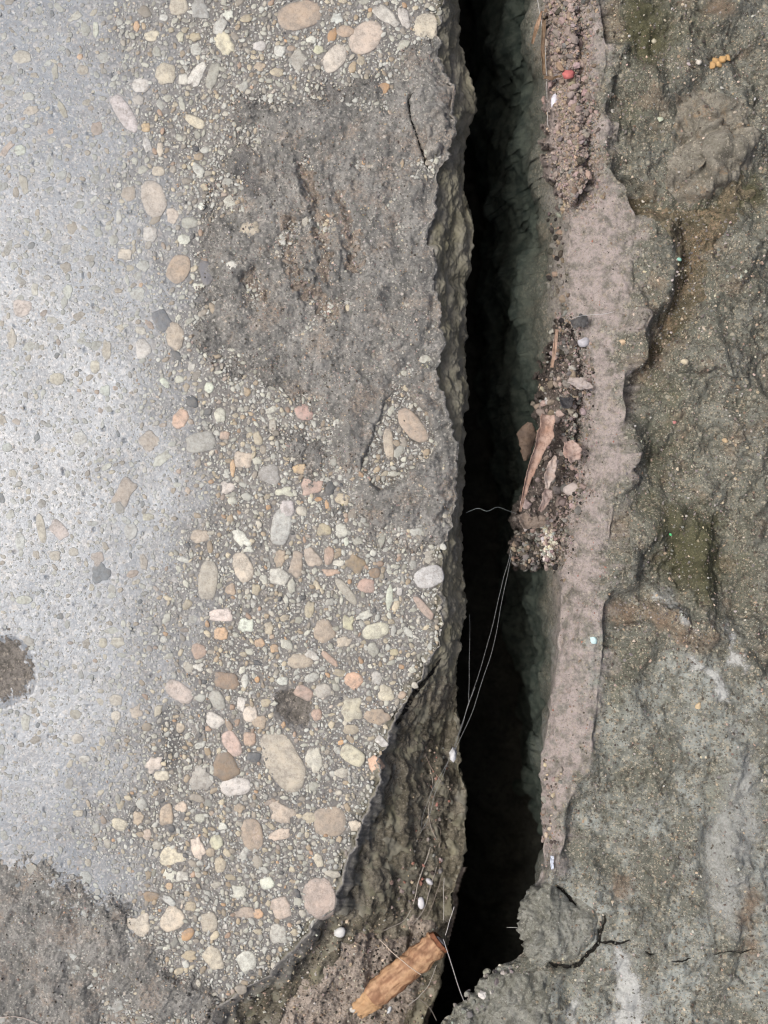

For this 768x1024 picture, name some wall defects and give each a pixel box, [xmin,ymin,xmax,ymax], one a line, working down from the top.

crack [458,0,472,73]
crack [408,92,430,171]
spalling [191,34,459,556]
crack [397,136,576,1024]
spalling [0,852,223,1024]
crack [549,915,754,969]